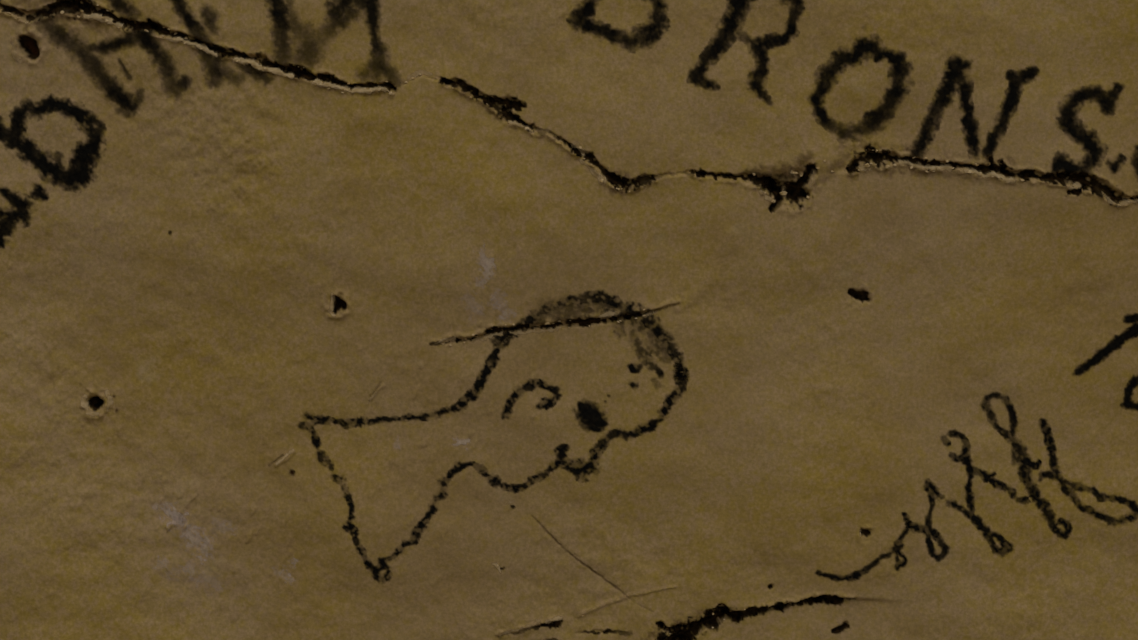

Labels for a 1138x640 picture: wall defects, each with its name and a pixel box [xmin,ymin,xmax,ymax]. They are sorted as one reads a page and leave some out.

crack [0,0,656,193]
crack [846,144,1138,207]
crack [499,615,622,636]
crack [656,595,844,640]